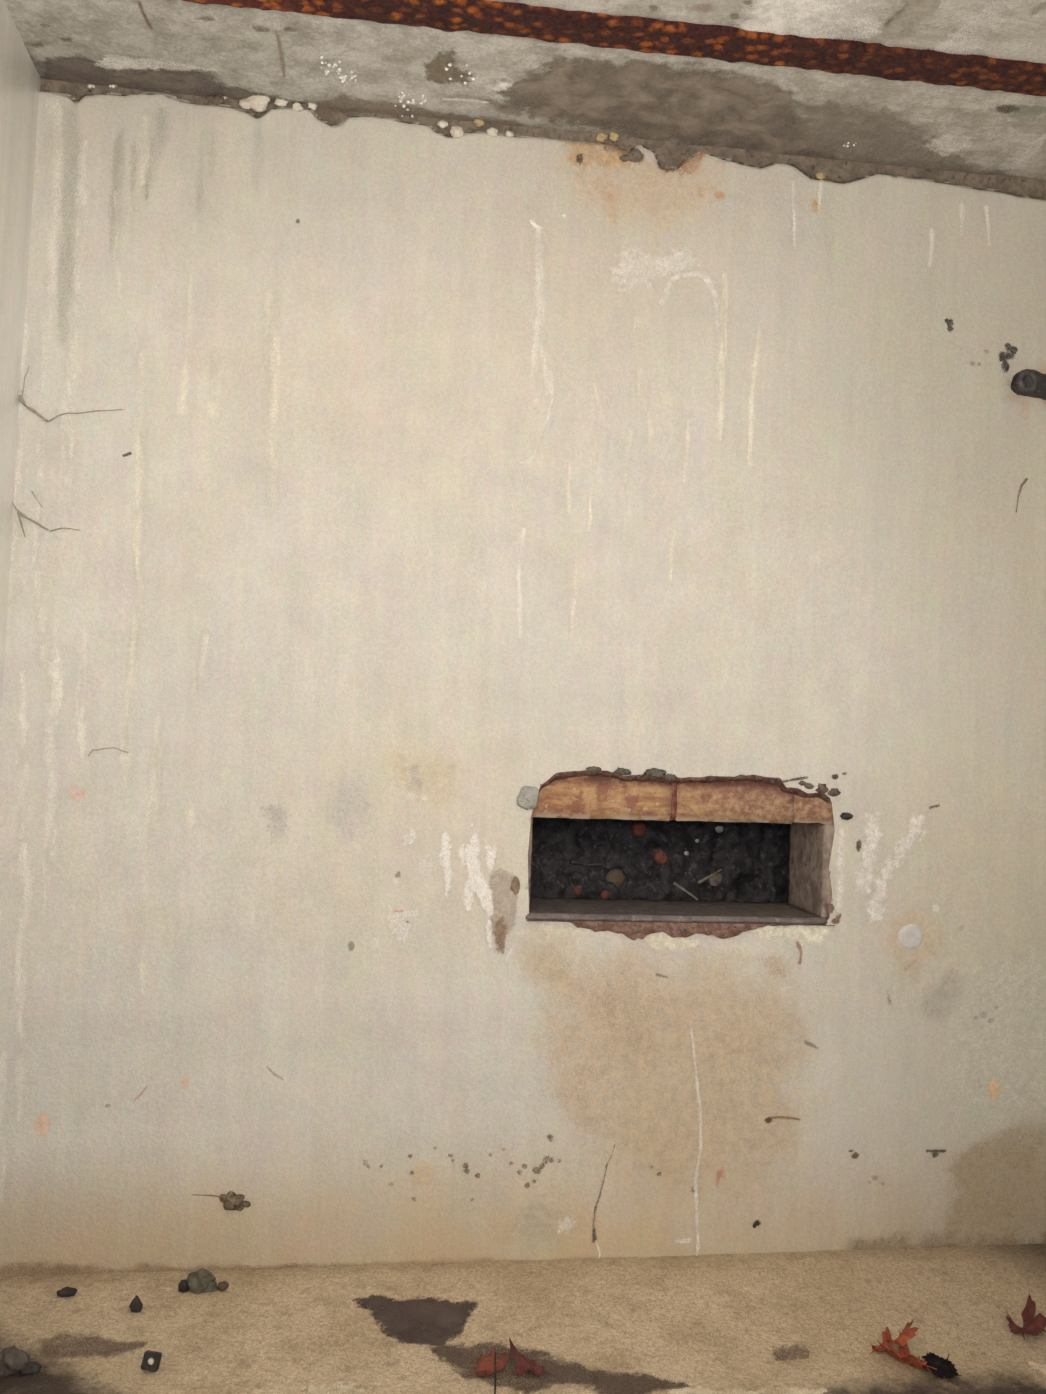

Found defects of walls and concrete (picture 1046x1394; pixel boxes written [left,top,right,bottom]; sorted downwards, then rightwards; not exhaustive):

water stain [688,0,752,20]
water stain [19,24,1025,298]
water stain [996,105,1046,118]
water stain [610,241,730,442]
water stain [0,95,91,1207]
flaking render [539,766,841,803]
flaking render [400,807,927,965]
water stain [0,912,839,1294]
water stain [847,937,1046,1250]
water stain [36,1332,154,1360]